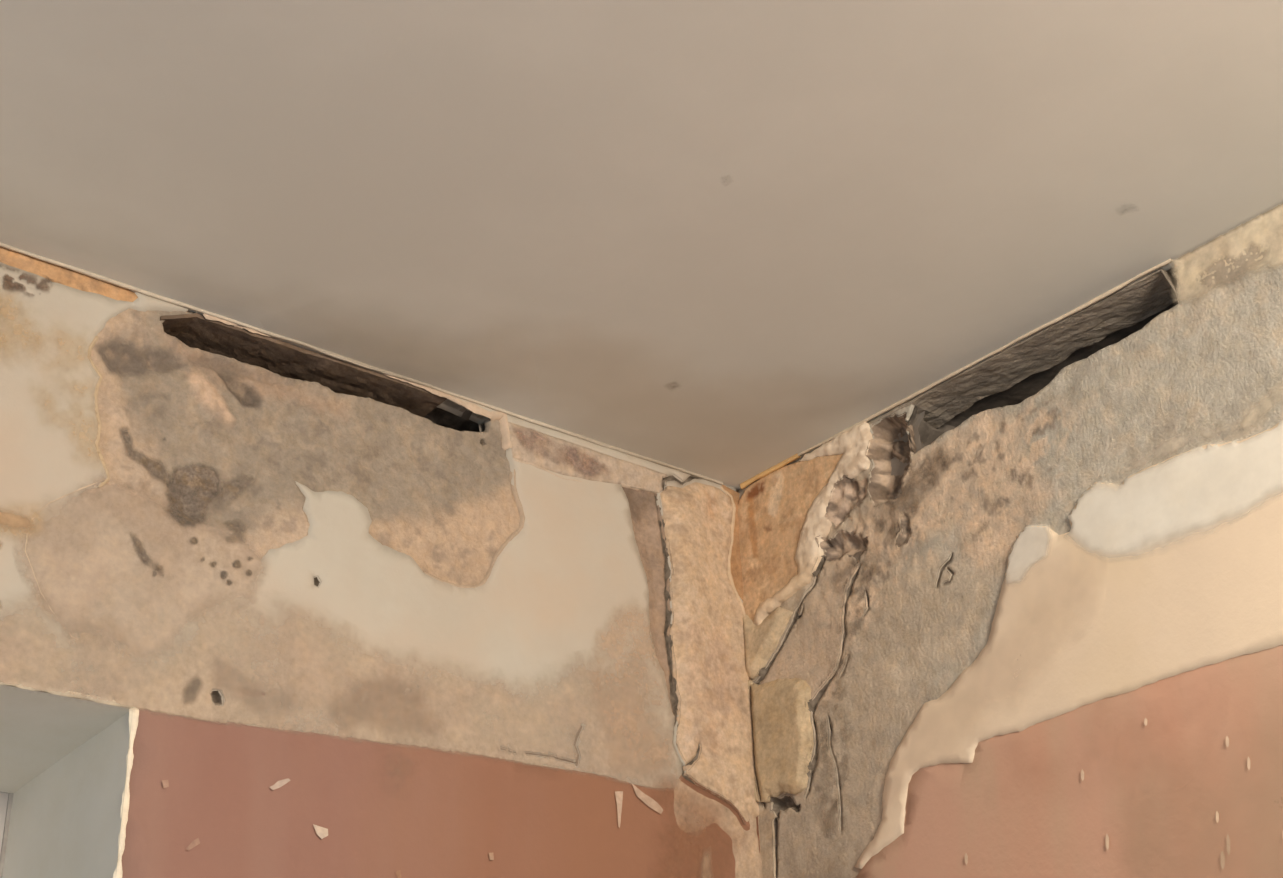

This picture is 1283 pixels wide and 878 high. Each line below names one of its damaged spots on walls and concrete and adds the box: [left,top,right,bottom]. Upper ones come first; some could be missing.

water stain [0,274,52,334]
water stain [133,535,164,576]
water stain [121,428,253,544]
water stain [202,557,253,585]
spalling [0,247,525,657]
spalling [615,257,1283,878]
water stain [0,610,677,789]
crack [654,474,778,876]
crack [748,555,870,831]